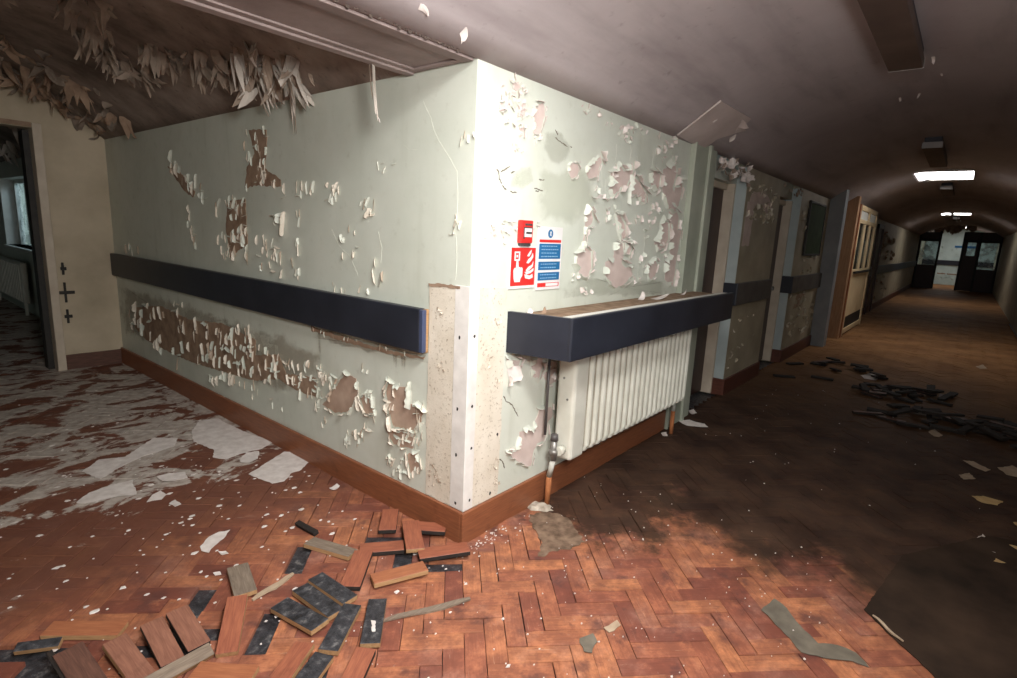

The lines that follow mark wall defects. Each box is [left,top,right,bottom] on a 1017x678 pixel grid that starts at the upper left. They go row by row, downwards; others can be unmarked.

peeling [499,72,548,154]
peeling [167,125,340,280]
peeling [359,197,375,219]
peeling [358,259,383,296]
peeling [567,100,751,300]
flaking render [129,283,559,512]